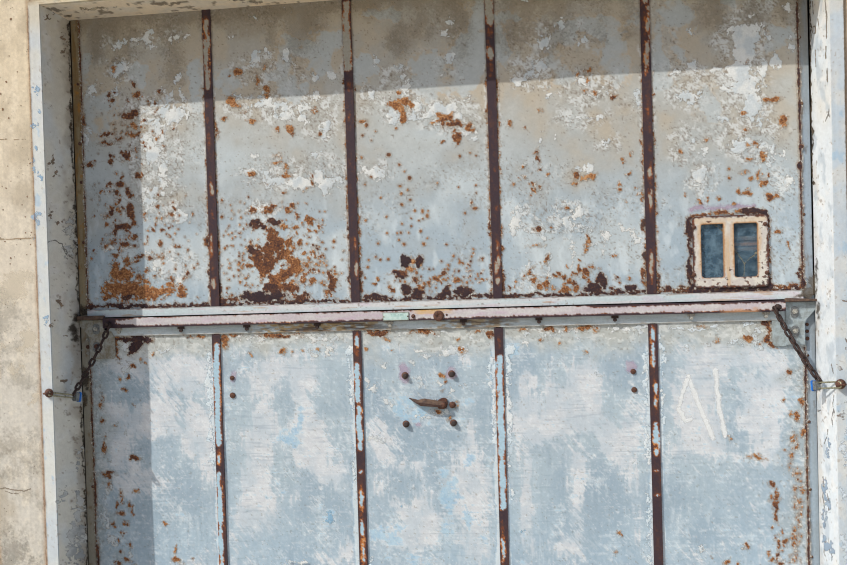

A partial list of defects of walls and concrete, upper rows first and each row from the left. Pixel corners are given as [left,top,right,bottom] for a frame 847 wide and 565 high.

peeling [233,70,337,142]
peeling [381,64,479,141]
peeling [669,13,795,169]
peeling [136,72,190,224]
peeling [231,150,347,197]
corrosion [77,0,807,310]
peeling [145,249,186,287]
corrosion [115,335,154,392]
corrosion [539,325,600,342]
corrosion [740,321,778,349]
corrosion [89,363,140,565]
corrosion [767,346,812,565]